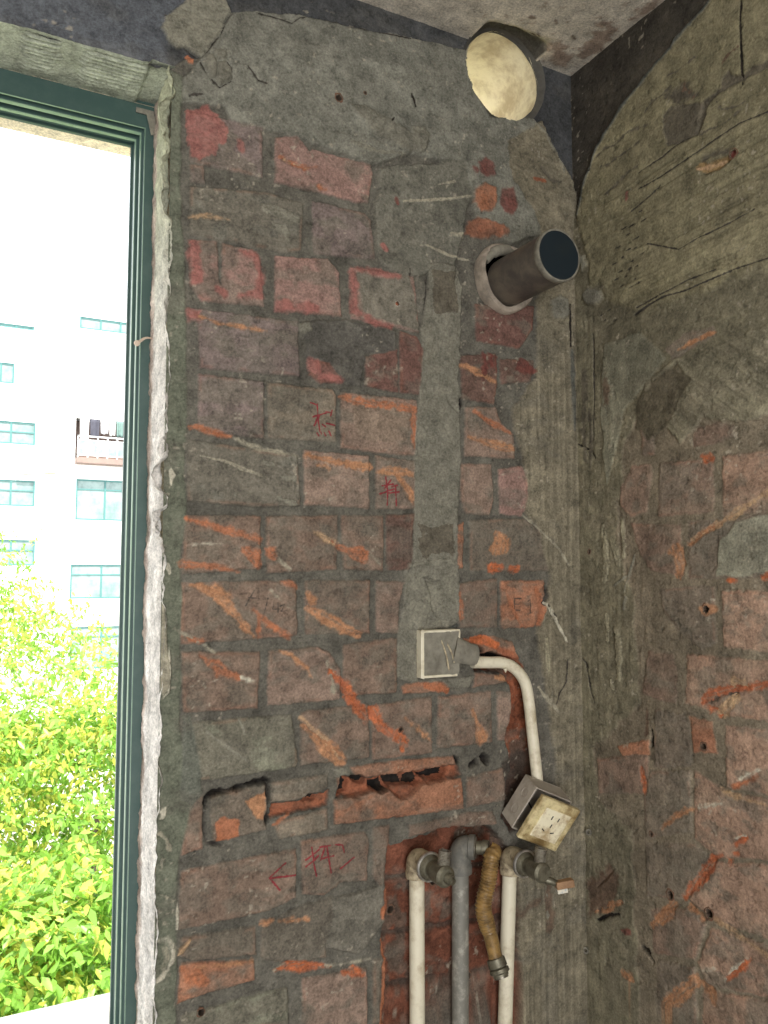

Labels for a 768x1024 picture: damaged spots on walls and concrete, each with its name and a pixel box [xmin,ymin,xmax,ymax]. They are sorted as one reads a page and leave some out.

crack [630,110,768,213]
crack [646,208,755,251]
crack [634,257,768,316]
spalling [213,715,463,842]